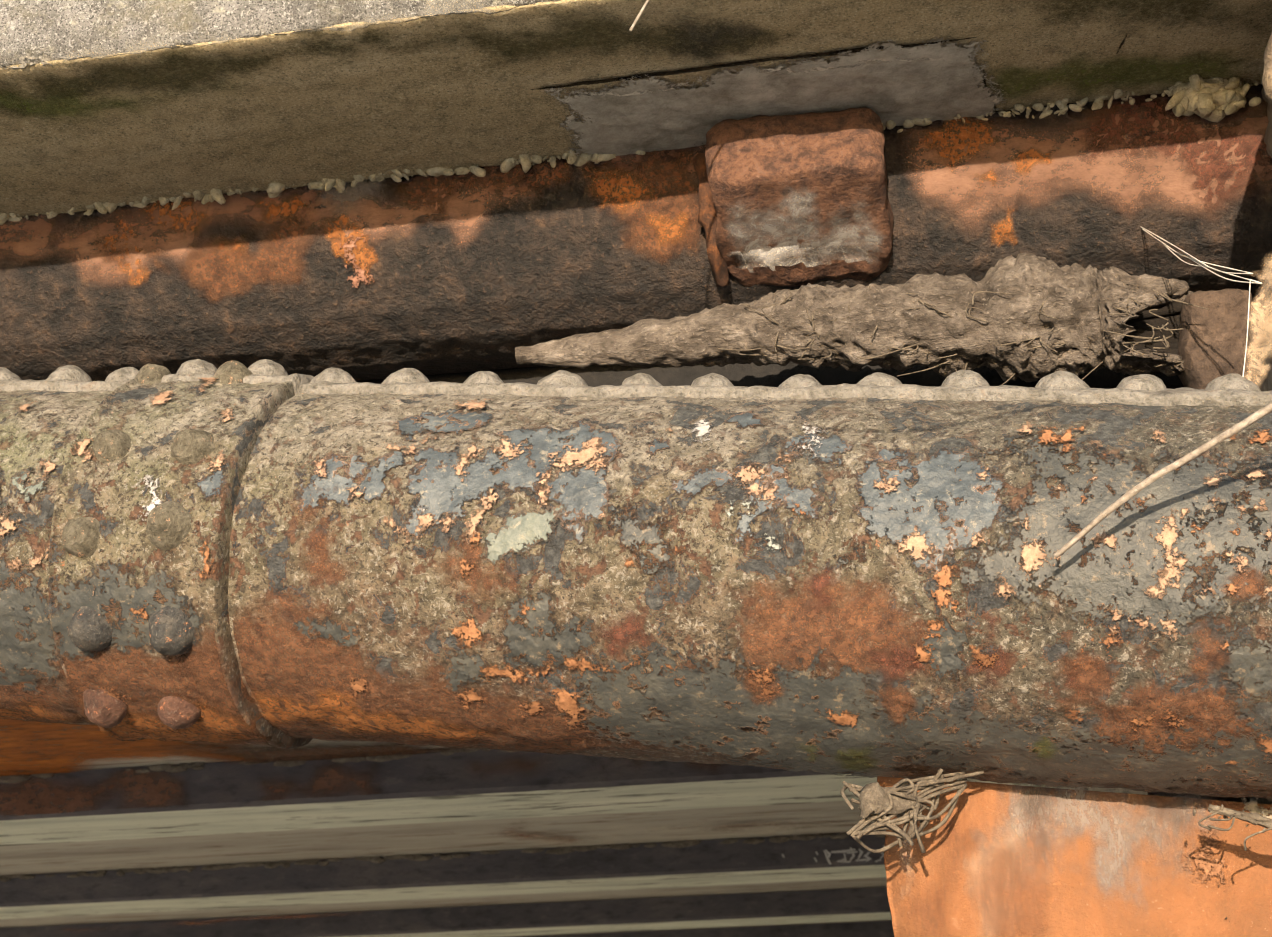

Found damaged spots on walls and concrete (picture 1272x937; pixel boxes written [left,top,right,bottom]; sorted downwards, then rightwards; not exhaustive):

leakage [452,17,778,60]
corrosion [0,143,706,301]
corrosion [909,96,1272,244]
peeling [0,436,94,538]
peeling [136,474,166,521]
peeling [195,448,244,507]
peeling [292,399,686,578]
peeling [0,544,211,695]
corrosion [744,569,924,679]
peeling [438,421,1272,819]
corrosion [0,592,647,816]
corrosion [1062,655,1258,783]